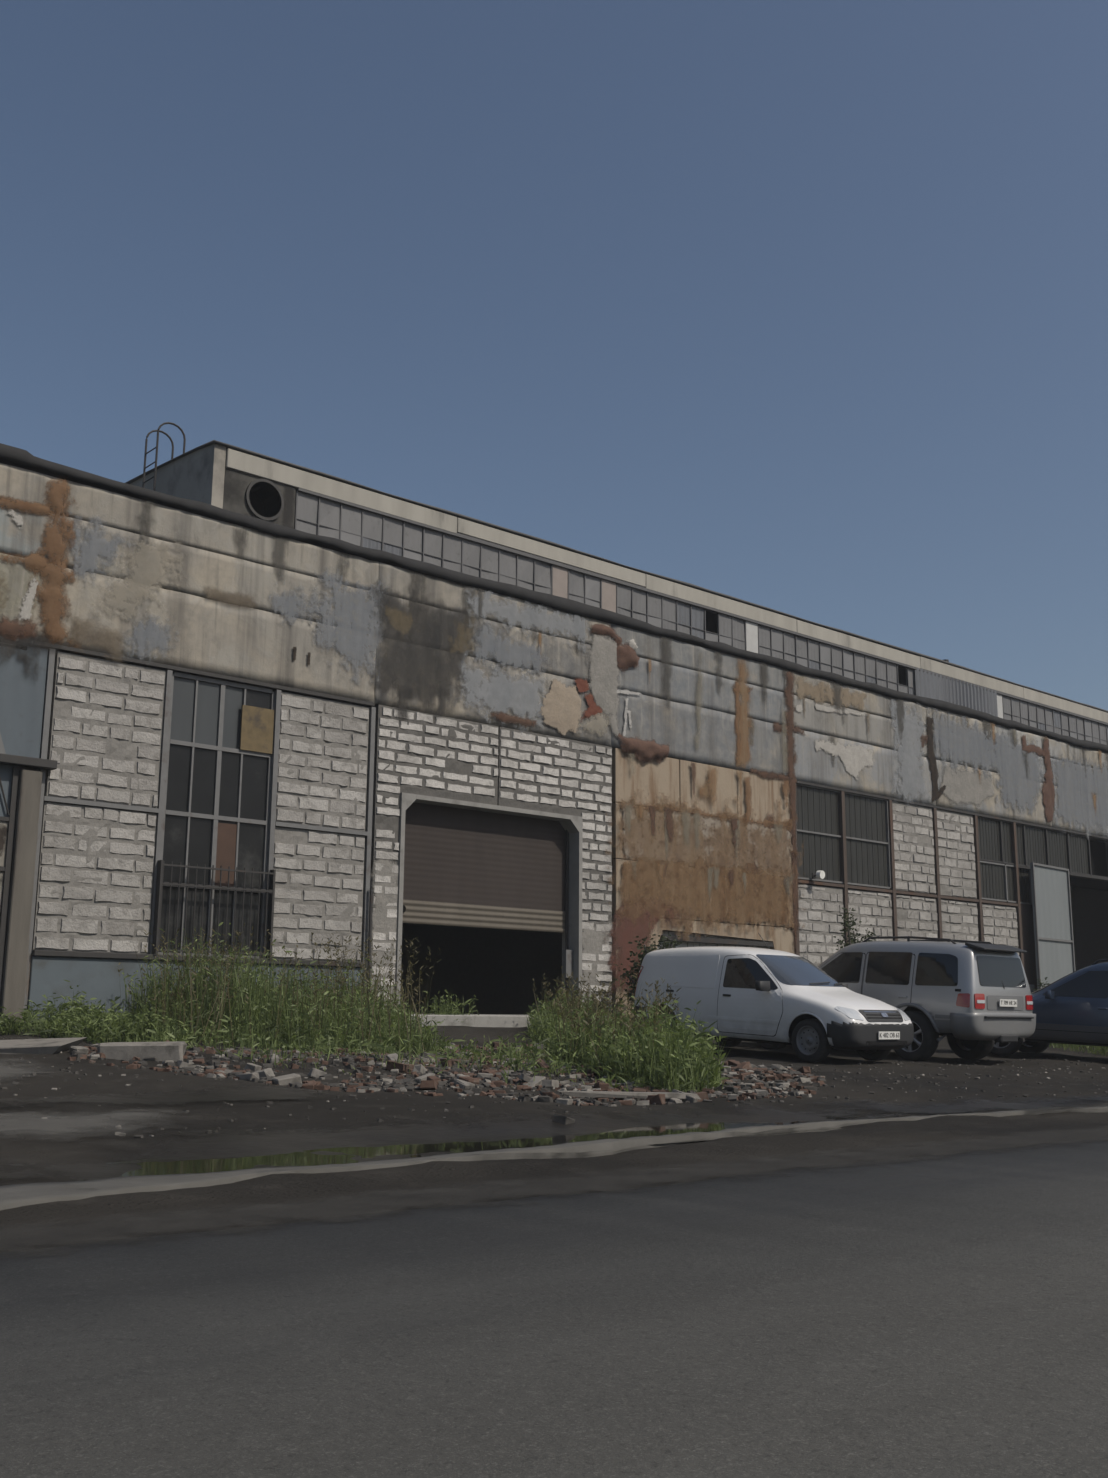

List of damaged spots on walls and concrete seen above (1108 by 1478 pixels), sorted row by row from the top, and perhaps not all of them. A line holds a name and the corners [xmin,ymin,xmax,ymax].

rust [0,478,80,648]
water stain [374,573,483,719]
peeling [460,590,620,736]
rust [620,661,805,954]
rust [1022,735,1055,822]